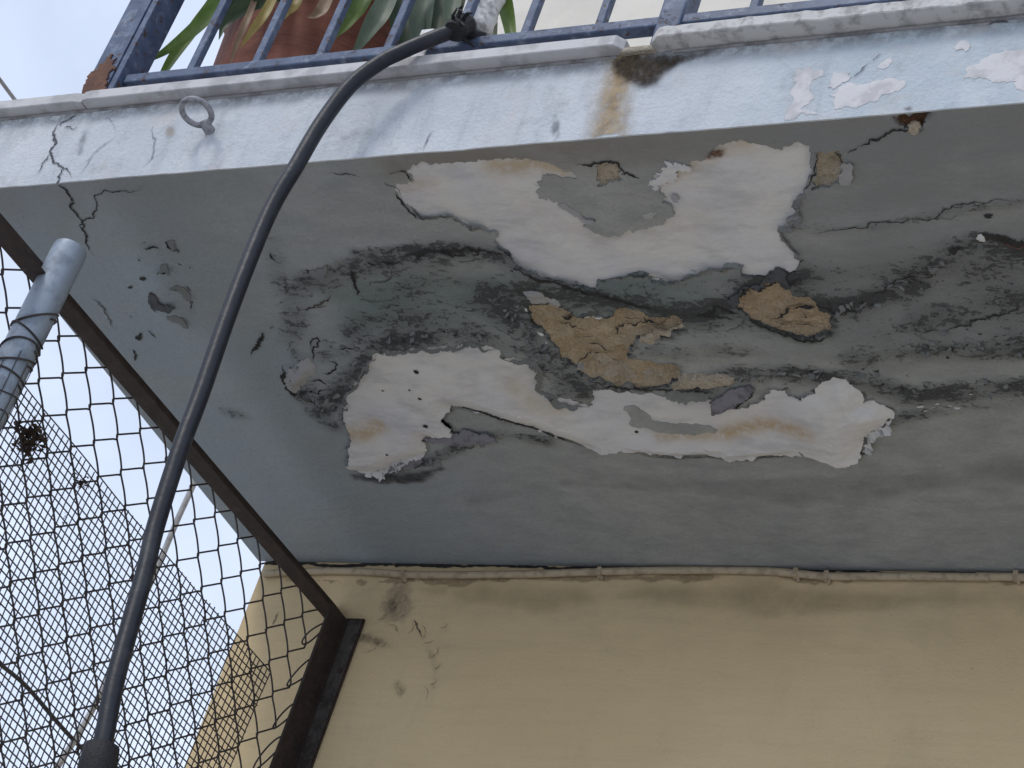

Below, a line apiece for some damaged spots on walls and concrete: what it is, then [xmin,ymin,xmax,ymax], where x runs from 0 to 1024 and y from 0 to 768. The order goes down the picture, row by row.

corrosion [595,52,707,137]
peeling [784,58,906,120]
crack [848,129,923,153]
spalling [897,112,928,135]
peeling [963,49,1024,91]
crack [38,115,156,253]
peeling [395,140,882,343]
crack [813,199,1024,255]
peeling [287,291,895,482]